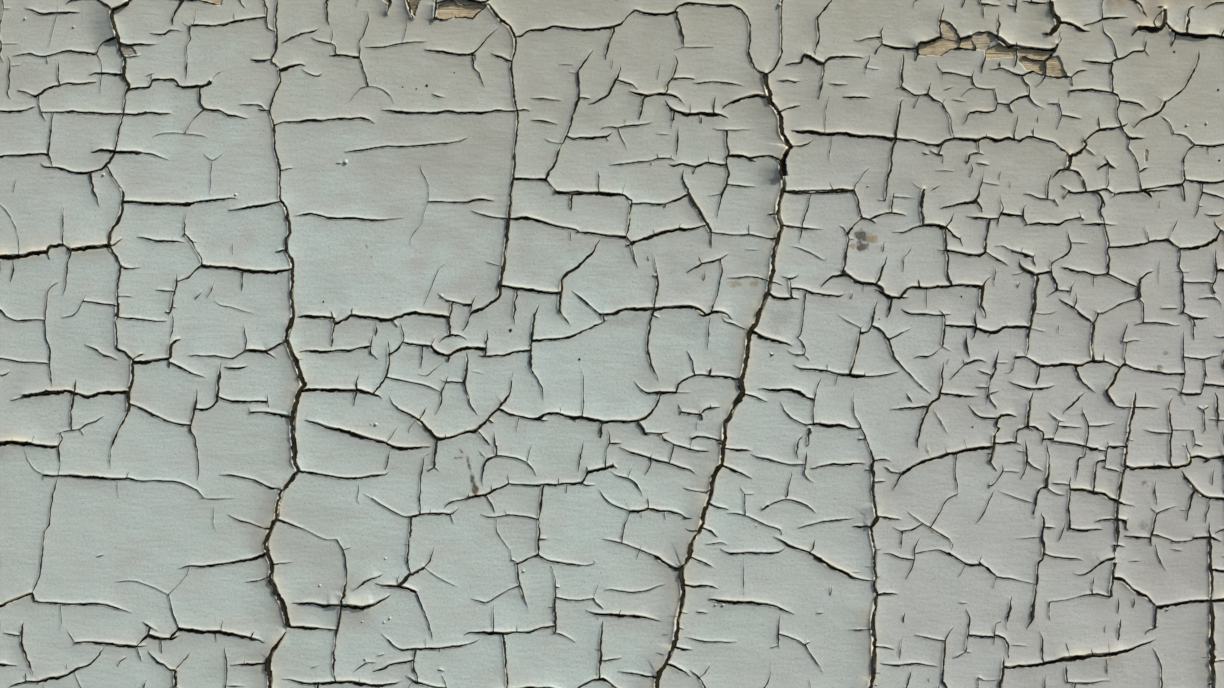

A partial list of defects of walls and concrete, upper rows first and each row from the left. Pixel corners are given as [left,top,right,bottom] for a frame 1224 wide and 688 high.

peeling [437,0,486,19]
crack [871,8,1084,128]
peeling [919,21,1066,77]
crack [1132,0,1224,45]
crack [1132,53,1224,165]
crack [297,213,400,221]
crack [0,283,57,384]
crack [893,359,979,450]
crack [353,429,661,688]
crack [886,514,1083,628]
crack [3,622,103,688]
crack [955,597,1154,688]